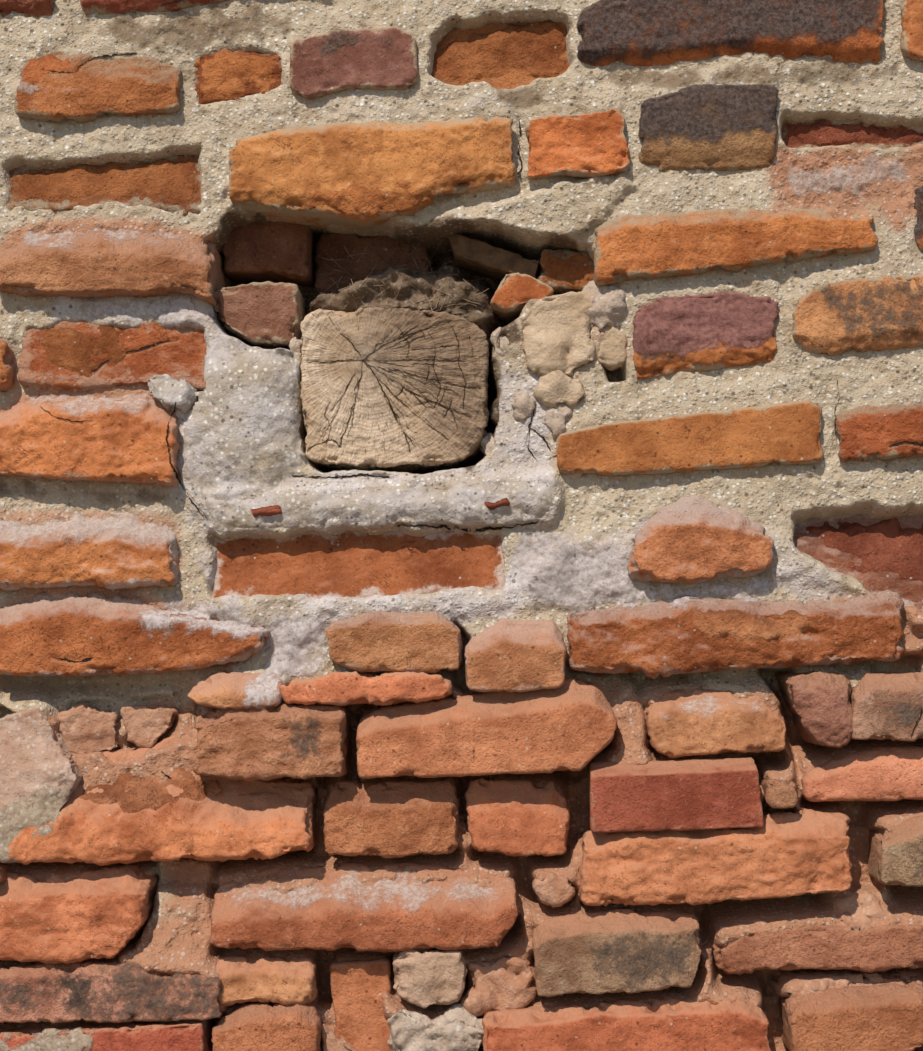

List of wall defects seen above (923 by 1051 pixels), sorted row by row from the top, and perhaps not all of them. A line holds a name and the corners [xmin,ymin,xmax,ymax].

crack [51,52,136,73]
crack [92,338,179,372]
crack [165,402,208,520]